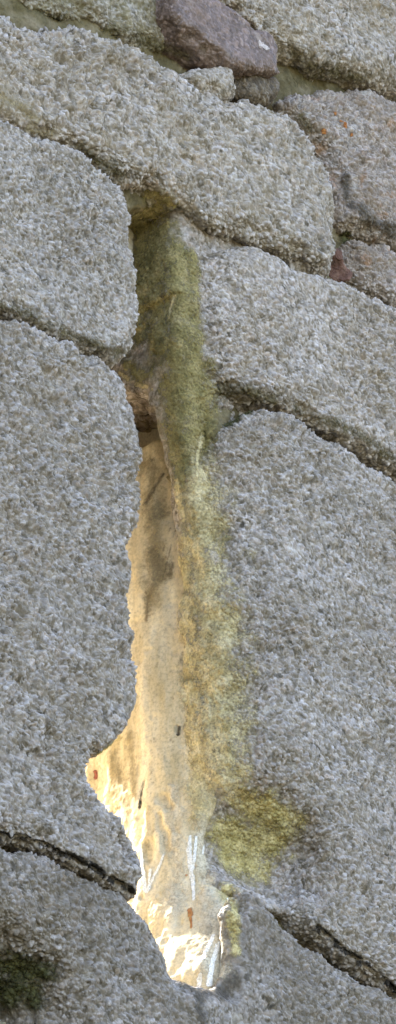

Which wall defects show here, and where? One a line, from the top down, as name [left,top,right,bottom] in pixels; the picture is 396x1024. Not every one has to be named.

water stain [185,249,207,377]
water stain [195,433,203,478]
water stain [162,474,186,522]
crack [0,831,136,894]
crack [314,926,396,993]